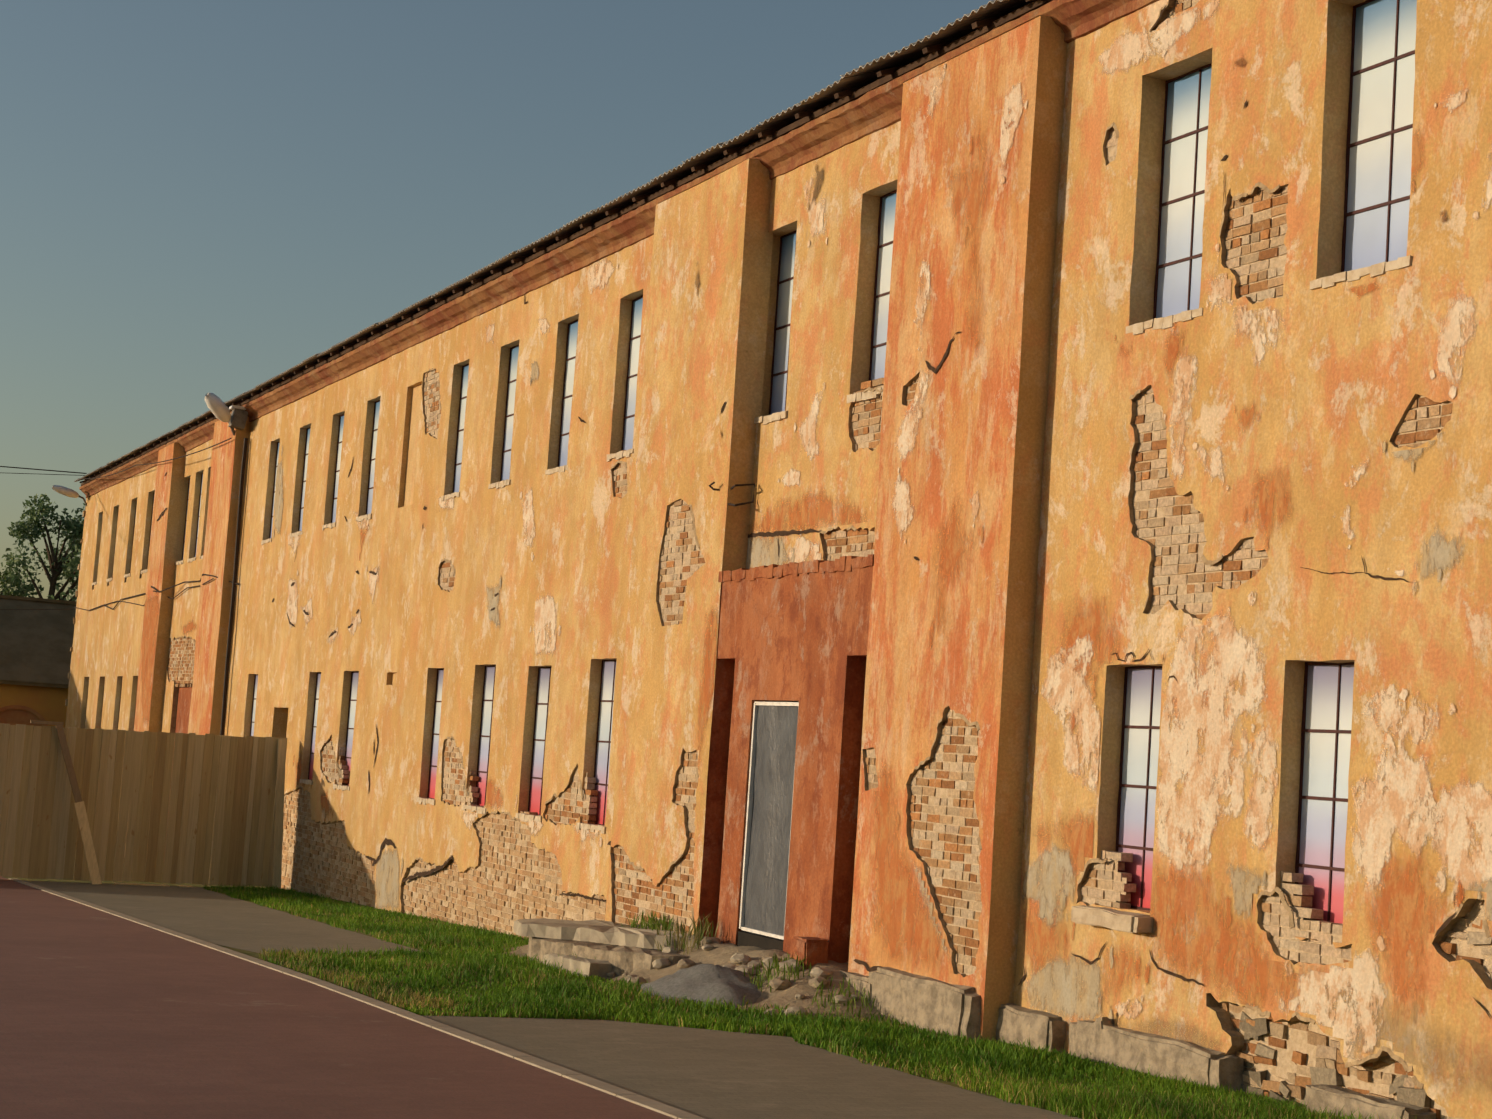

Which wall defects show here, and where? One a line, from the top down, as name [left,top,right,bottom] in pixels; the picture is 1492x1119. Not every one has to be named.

flaking render [1206,182,1288,364]
flaking render [421,368,441,438]
flaking render [659,500,705,626]
flaking render [788,525,875,563]
flaking render [851,373,929,544]
peeling [1129,354,1279,870]
flaking render [1394,295,1475,448]
flaking render [400,736,705,939]
flaking render [910,709,991,976]
flaking render [1077,850,1136,909]
peeling [1352,684,1492,980]
flaking render [1216,871,1464,1119]